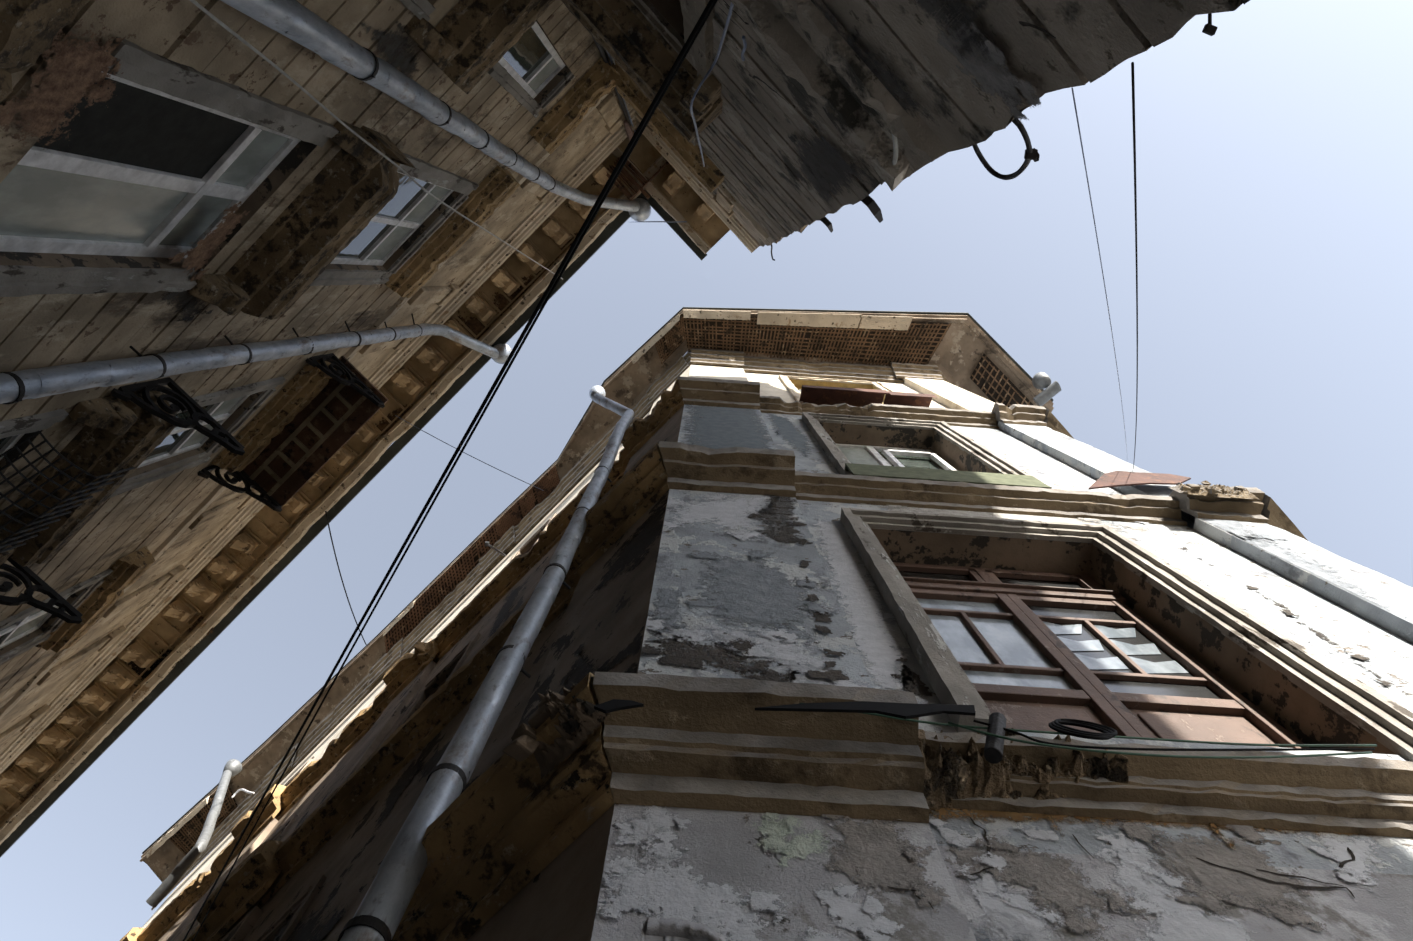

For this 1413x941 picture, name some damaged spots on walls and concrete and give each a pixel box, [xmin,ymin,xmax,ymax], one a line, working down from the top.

peeling [641,493,934,704]
peeling [597,805,792,941]
flaking render [753,812,1327,941]
peeling [1301,834,1391,893]